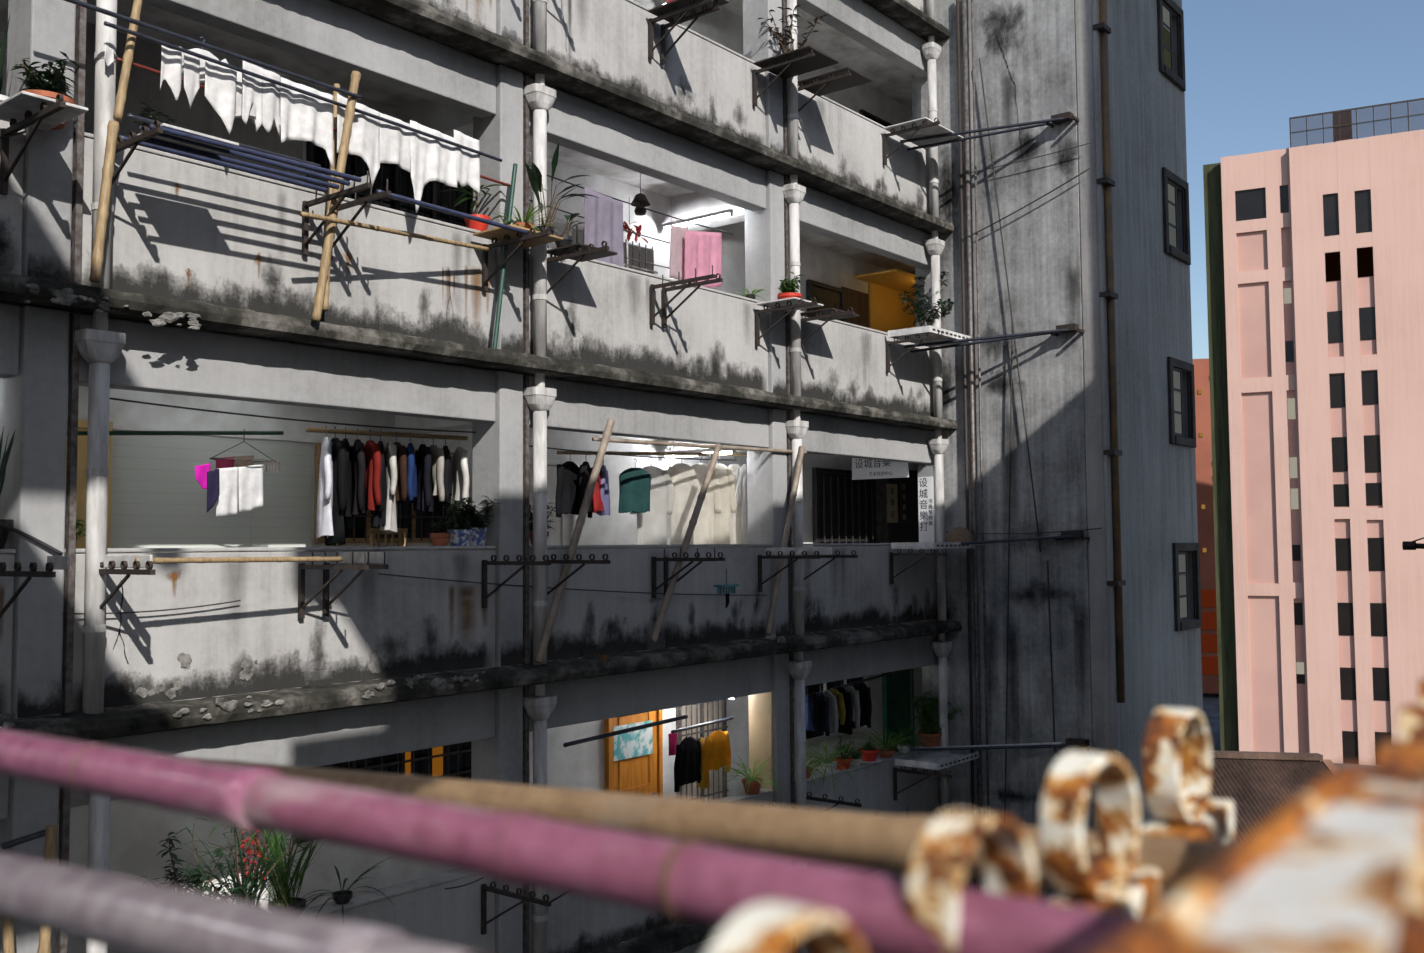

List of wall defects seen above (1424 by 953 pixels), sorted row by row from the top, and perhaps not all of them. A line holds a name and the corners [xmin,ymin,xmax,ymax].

damp [987,8,1022,50]
damp [1017,135,1038,160]
damp [1059,147,1074,169]
damp [939,151,956,240]
damp [942,367,951,419]
damp [988,375,1009,394]
corrosion [1100,764,1424,953]